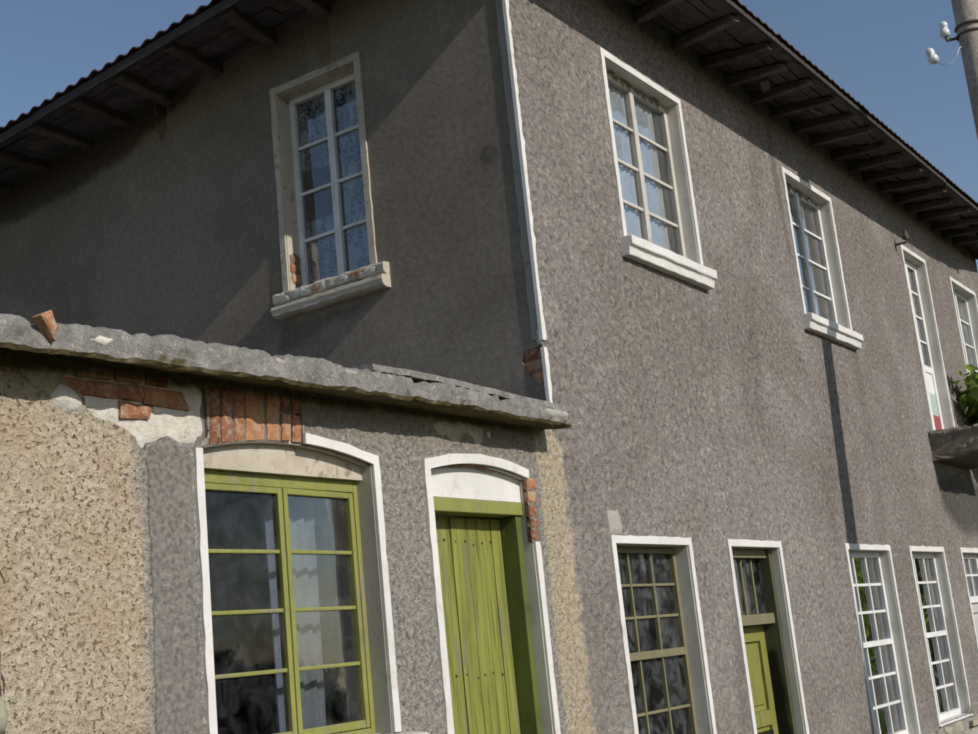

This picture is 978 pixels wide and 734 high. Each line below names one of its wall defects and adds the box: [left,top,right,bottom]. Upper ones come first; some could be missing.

spalling [91,335,114,345]
flaking render [523,330,544,385]
flaking render [63,365,203,448]